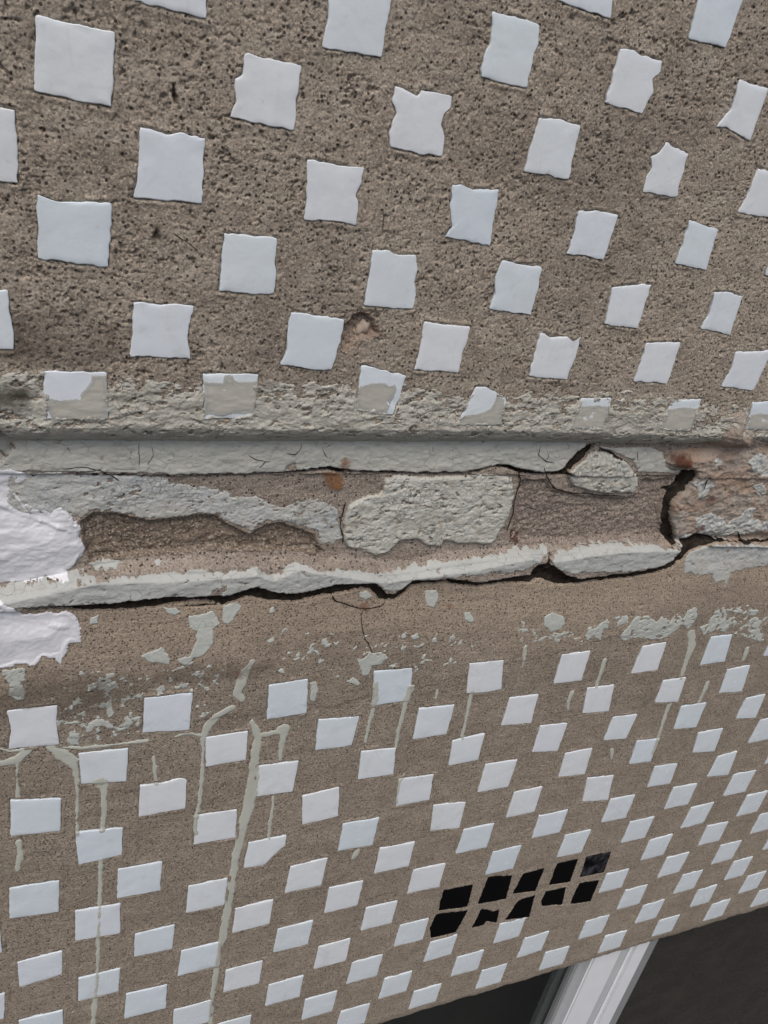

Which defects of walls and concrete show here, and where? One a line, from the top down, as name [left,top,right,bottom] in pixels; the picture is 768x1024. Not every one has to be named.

spalling [340,310,387,355]
crack [250,444,445,473]
crack [473,444,638,531]
peeling [0,370,768,746]
crack [55,469,768,652]